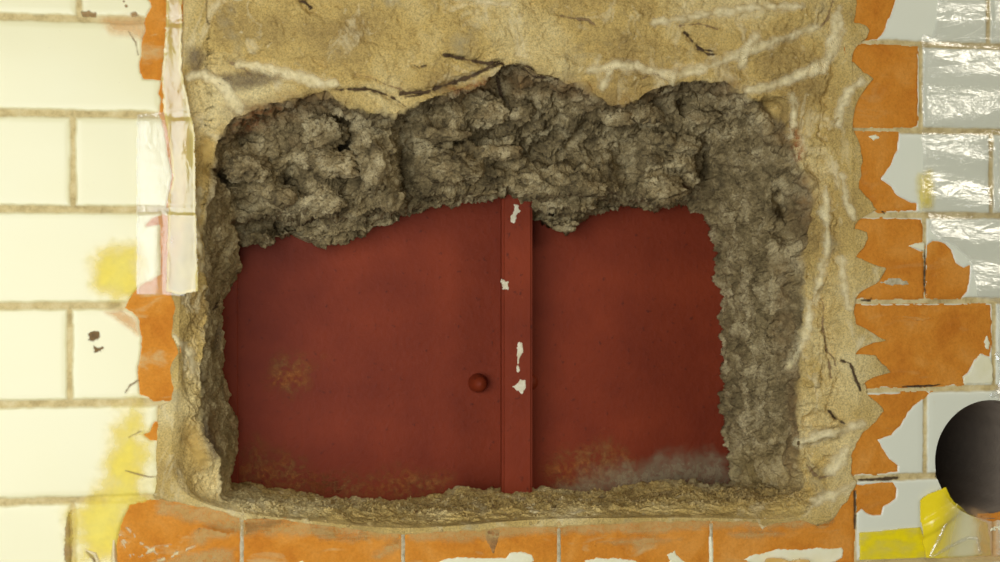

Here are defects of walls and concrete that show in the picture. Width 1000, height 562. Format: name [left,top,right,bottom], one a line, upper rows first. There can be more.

crack [336,53,551,106]
spalling [198,63,814,500]
peeling [963,336,993,385]
peeling [440,552,534,562]
peeling [667,551,684,562]
peeling [744,547,843,562]